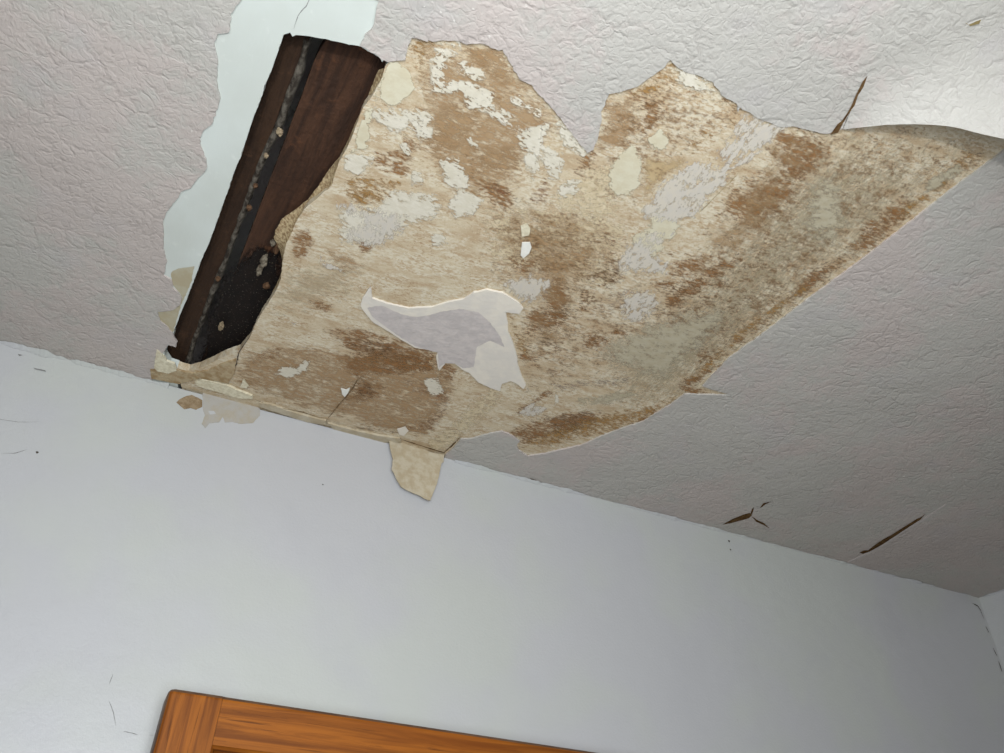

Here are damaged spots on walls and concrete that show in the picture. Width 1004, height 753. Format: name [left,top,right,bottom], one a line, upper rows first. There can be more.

flaking render [150,0,1004,501]
crack [847,504,946,563]